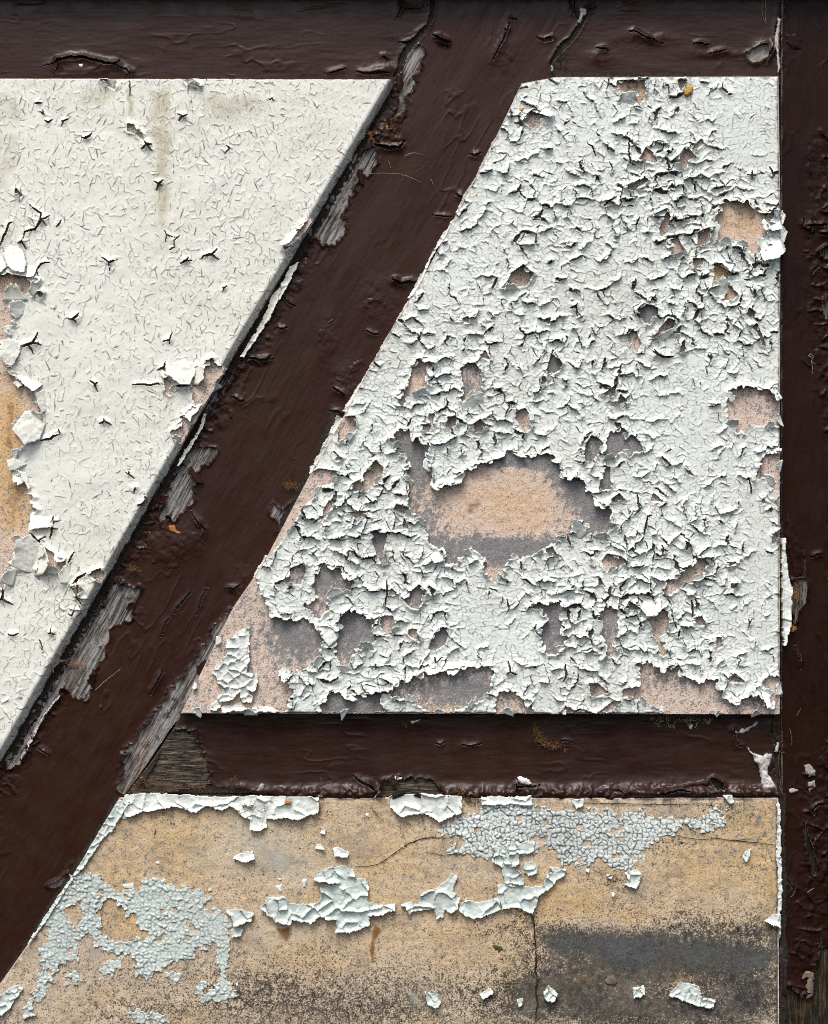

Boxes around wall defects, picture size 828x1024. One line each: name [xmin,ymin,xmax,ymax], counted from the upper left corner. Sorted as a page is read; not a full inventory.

peeling [653,196,788,303]
peeling [0,245,83,596]
crack [0,0,452,760]
peeling [159,262,299,521]
peeling [725,383,784,433]
peeling [0,337,734,1019]
peeling [589,541,783,718]
crack [357,836,465,867]
peeling [764,802,783,938]
corrosion [370,926,380,960]
crack [532,917,542,1021]
water stain [540,925,785,1013]